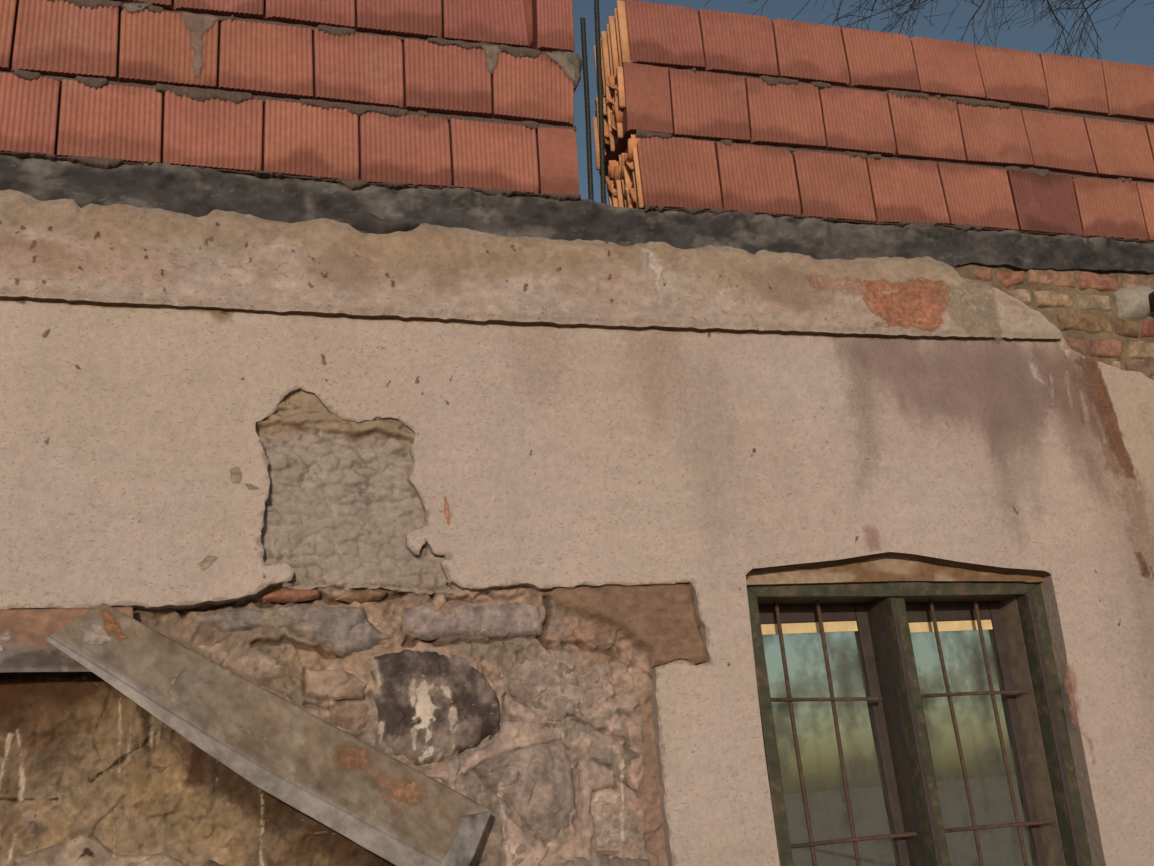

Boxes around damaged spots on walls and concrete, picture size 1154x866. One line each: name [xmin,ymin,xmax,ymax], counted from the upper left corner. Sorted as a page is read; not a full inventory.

peeling [809,264,1154,380]
leakage [855,337,1089,448]
rust [1072,354,1135,484]
peeling [79,622,112,645]
spalling [128,388,710,866]
spalling [0,672,371,866]